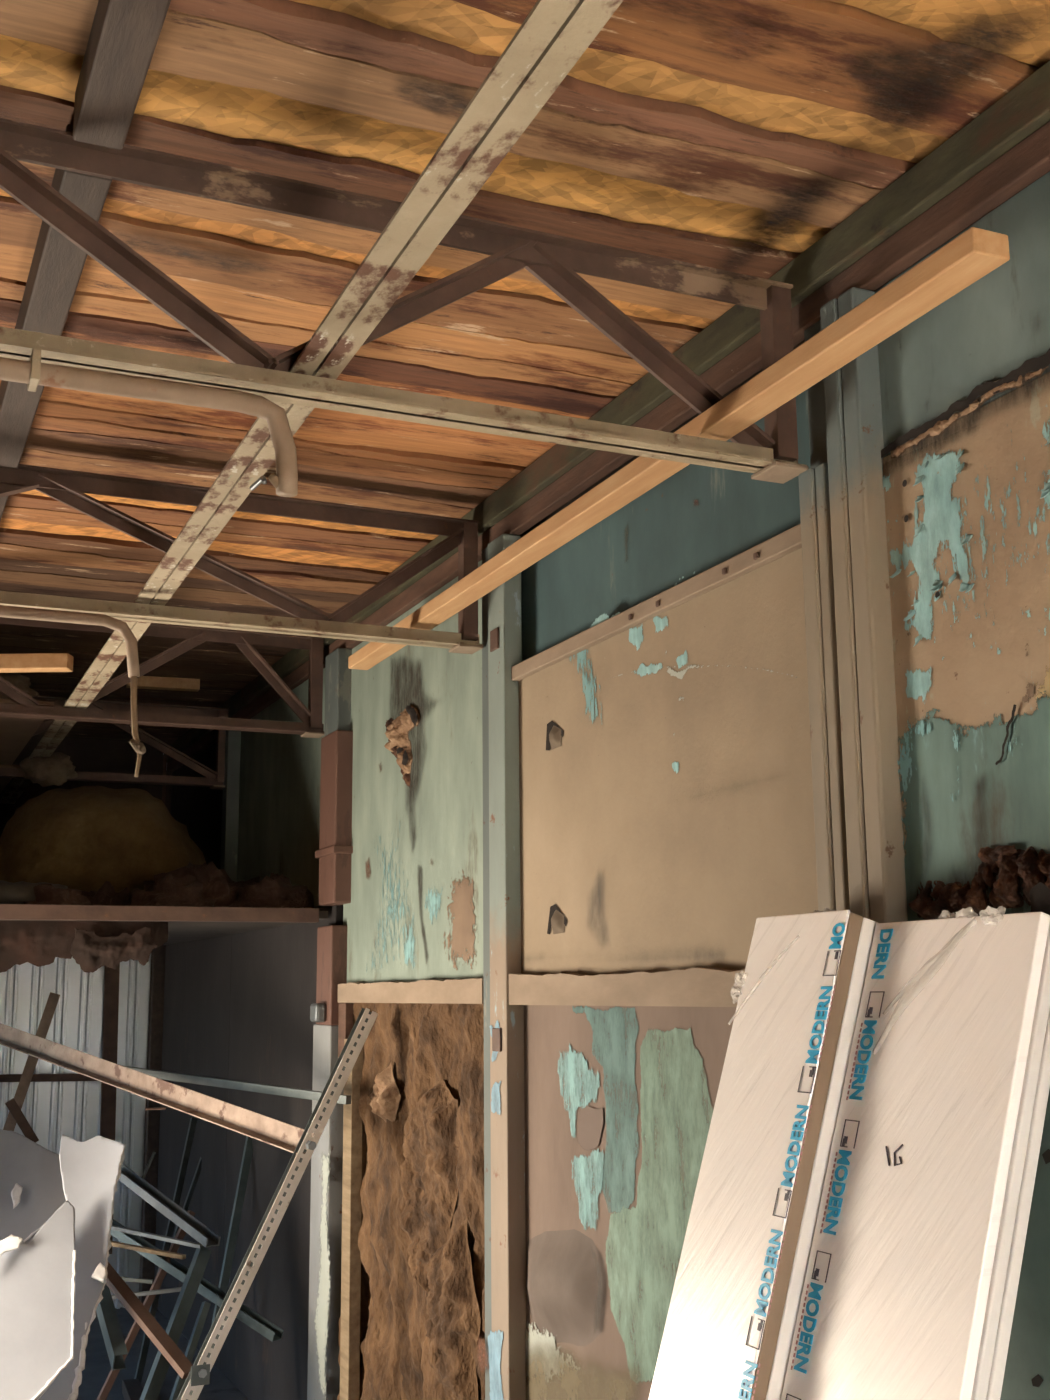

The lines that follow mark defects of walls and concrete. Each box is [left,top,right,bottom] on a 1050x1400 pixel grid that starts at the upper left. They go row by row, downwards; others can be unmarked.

damp [851,22,1034,132]
damp [391,659,429,812]
peeling [883,449,1050,921]
peeling [558,1006,713,1383]
peeling [525,1322,580,1375]